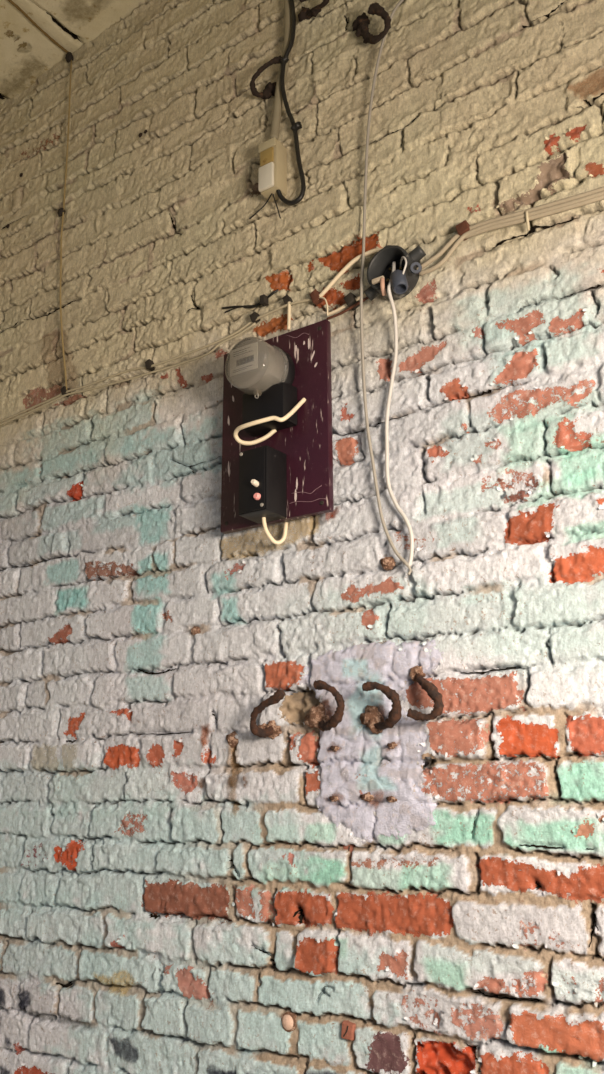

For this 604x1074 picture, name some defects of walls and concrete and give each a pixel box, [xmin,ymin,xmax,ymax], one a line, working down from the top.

crack [30,0,81,42]
spalling [496,124,587,213]
peeling [376,340,447,382]
peeling [440,378,470,402]
peeling [470,308,596,452]
peeling [470,438,560,546]
peeling [548,545,604,586]
peeling [103,738,198,798]
peeling [475,857,604,904]
peeling [139,878,454,975]
peeling [161,963,214,1006]
peeling [365,949,604,1074]